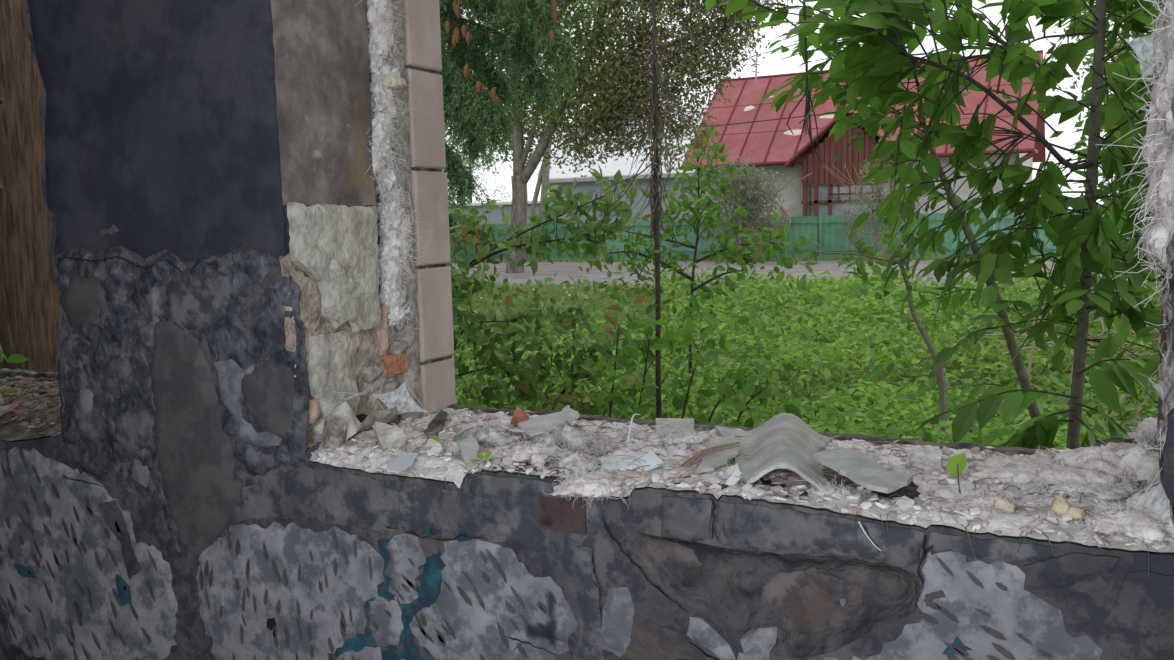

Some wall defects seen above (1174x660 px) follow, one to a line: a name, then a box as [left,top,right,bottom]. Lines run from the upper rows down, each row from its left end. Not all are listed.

peeling [28,0,414,552]
peeling [416,551,443,608]
peeling [335,628,373,658]
peeling [381,610,423,660]